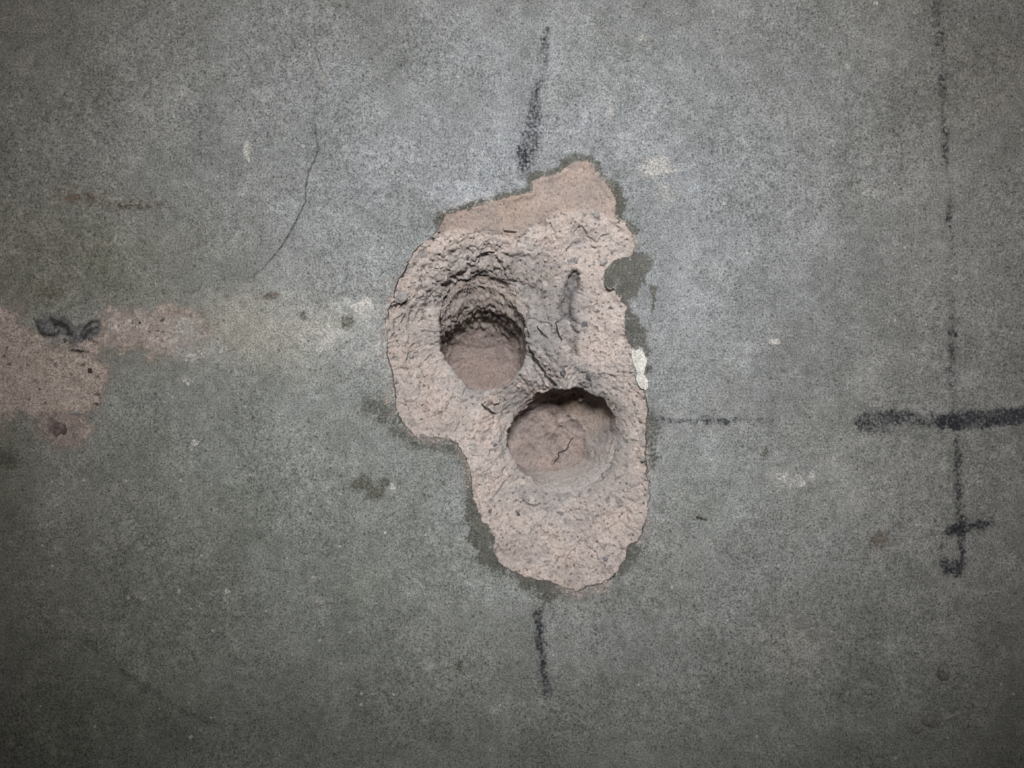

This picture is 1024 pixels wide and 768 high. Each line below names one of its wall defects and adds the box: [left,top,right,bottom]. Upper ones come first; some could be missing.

peeling [0,304,227,453]
spalling [380,159,652,602]